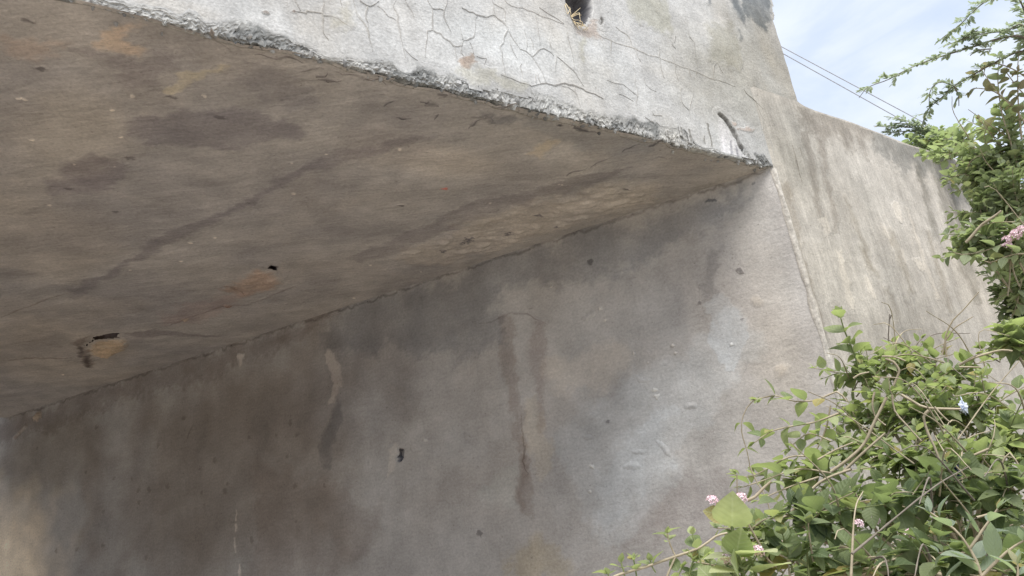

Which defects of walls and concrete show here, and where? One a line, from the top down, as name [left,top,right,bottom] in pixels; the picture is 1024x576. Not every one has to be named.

damp [34,150,139,199]
damp [119,56,328,153]
damp [64,133,441,300]
crack [1,0,803,419]
spalling [56,0,854,448]
damp [701,0,775,74]
damp [233,169,769,576]